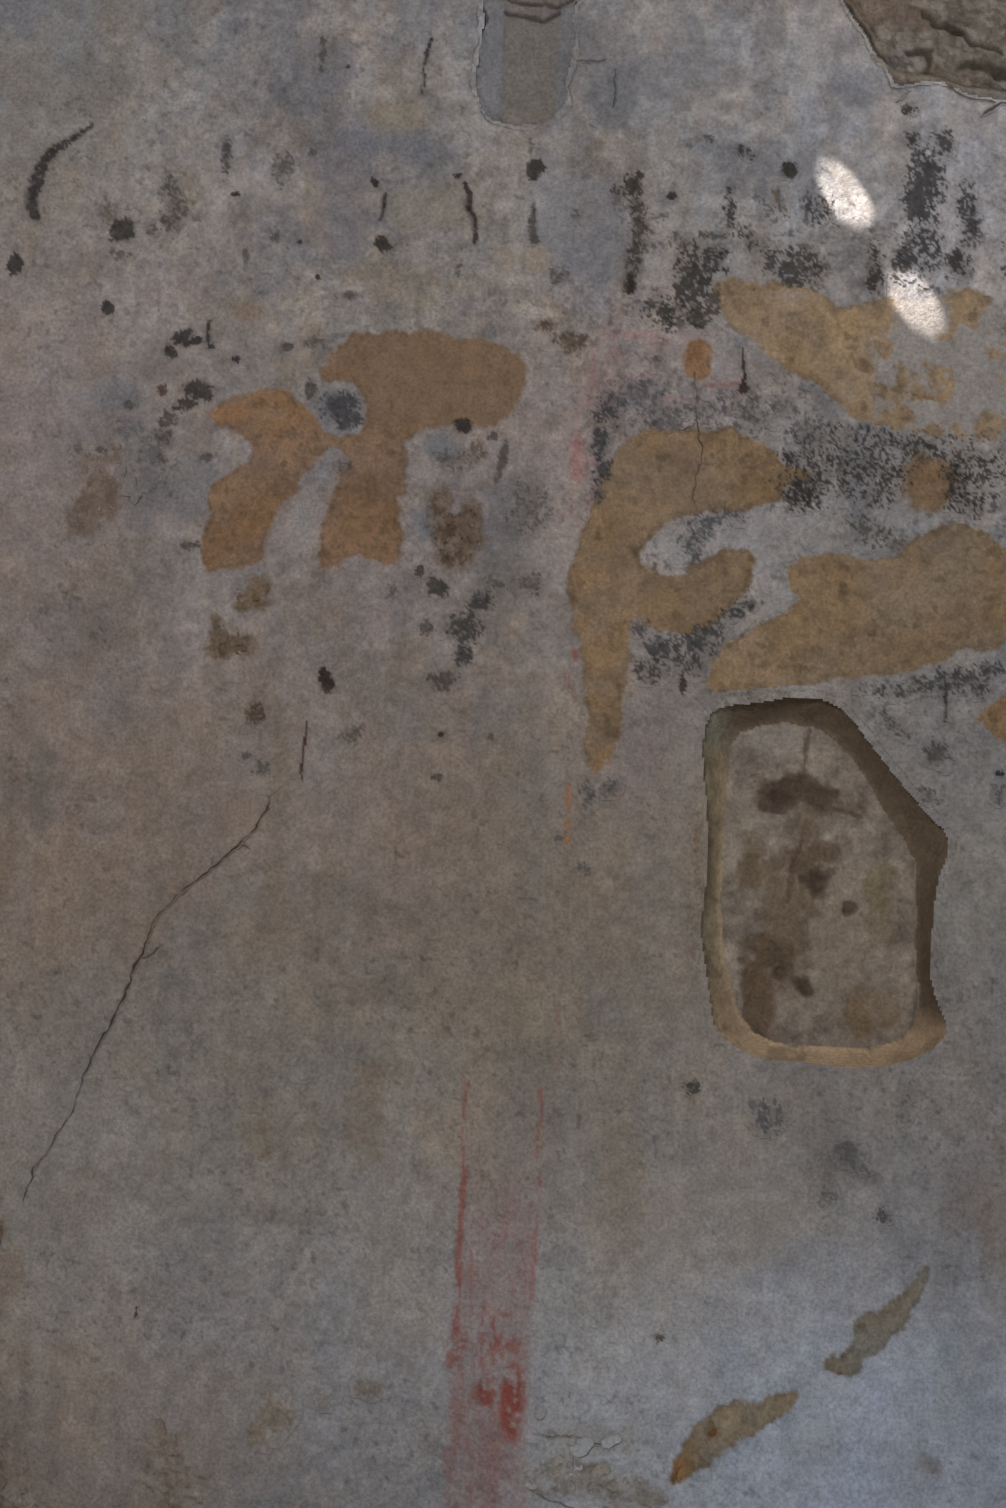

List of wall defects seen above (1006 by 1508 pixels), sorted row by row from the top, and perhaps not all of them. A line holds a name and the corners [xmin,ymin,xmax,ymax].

flaking render [460,0,598,140]
spalling [831,0,1006,112]
leakage [607,160,835,337]
leakage [862,100,1006,312]
spalling [419,478,491,583]
leakage [584,372,1006,557]
leakage [414,564,548,694]
leakage [625,596,762,696]
leakage [850,658,1006,808]
crack [23,786,282,1200]
flaking render [820,1262,934,1379]
peeling [517,1388,801,1508]